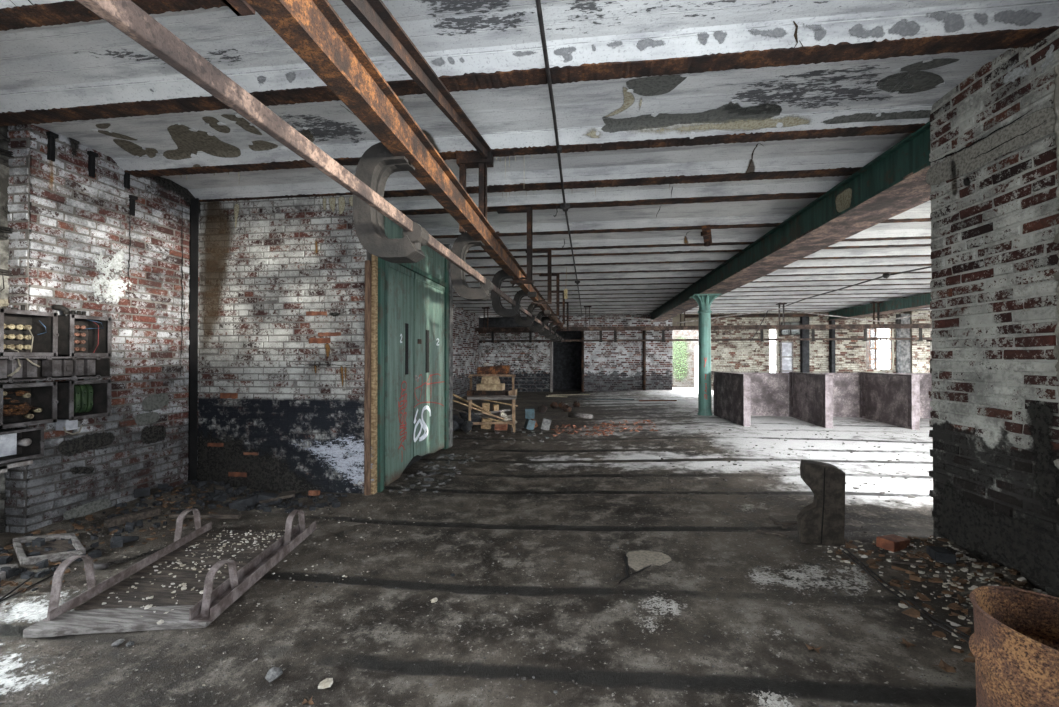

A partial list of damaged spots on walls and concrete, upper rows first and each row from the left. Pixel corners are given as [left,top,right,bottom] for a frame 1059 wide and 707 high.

peeling [626,73,690,96]
peeling [91,114,278,167]
peeling [596,99,783,144]
peeling [821,110,931,124]
leakage [201,201,239,342]